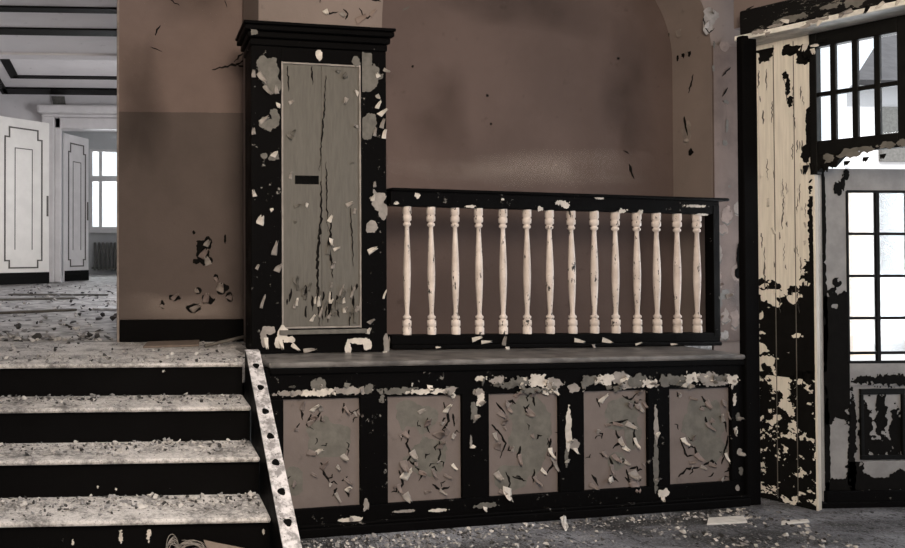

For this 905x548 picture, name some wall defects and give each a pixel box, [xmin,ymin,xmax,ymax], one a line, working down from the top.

peeling [251,55,294,135]
peeling [336,52,391,140]
peeling [782,71,793,108]
peeling [756,39,827,65]
crack [311,67,354,322]
peeling [366,181,399,233]
peeling [260,325,316,353]
peeling [344,319,376,353]
peeling [759,107,905,511]
peeling [272,377,476,513]
peeling [470,371,746,512]
peeling [338,498,369,522]